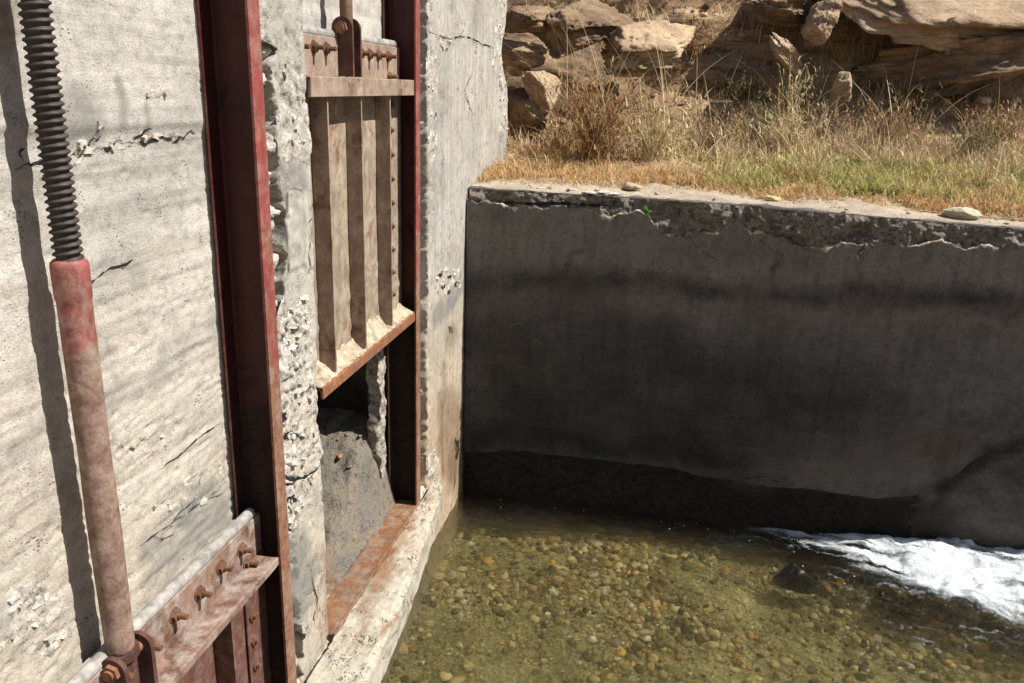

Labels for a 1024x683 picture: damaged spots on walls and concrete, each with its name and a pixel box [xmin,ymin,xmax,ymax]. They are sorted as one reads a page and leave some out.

crack [427,30,495,50]
spalling [261,38,312,185]
crack [16,148,42,169]
crack [69,128,194,158]
spalling [270,188,303,231]
spalling [469,187,1024,253]
crack [92,259,133,282]
spalling [434,266,461,299]
crack [160,423,219,469]
crack [138,493,223,548]
leakage [893,500,955,539]